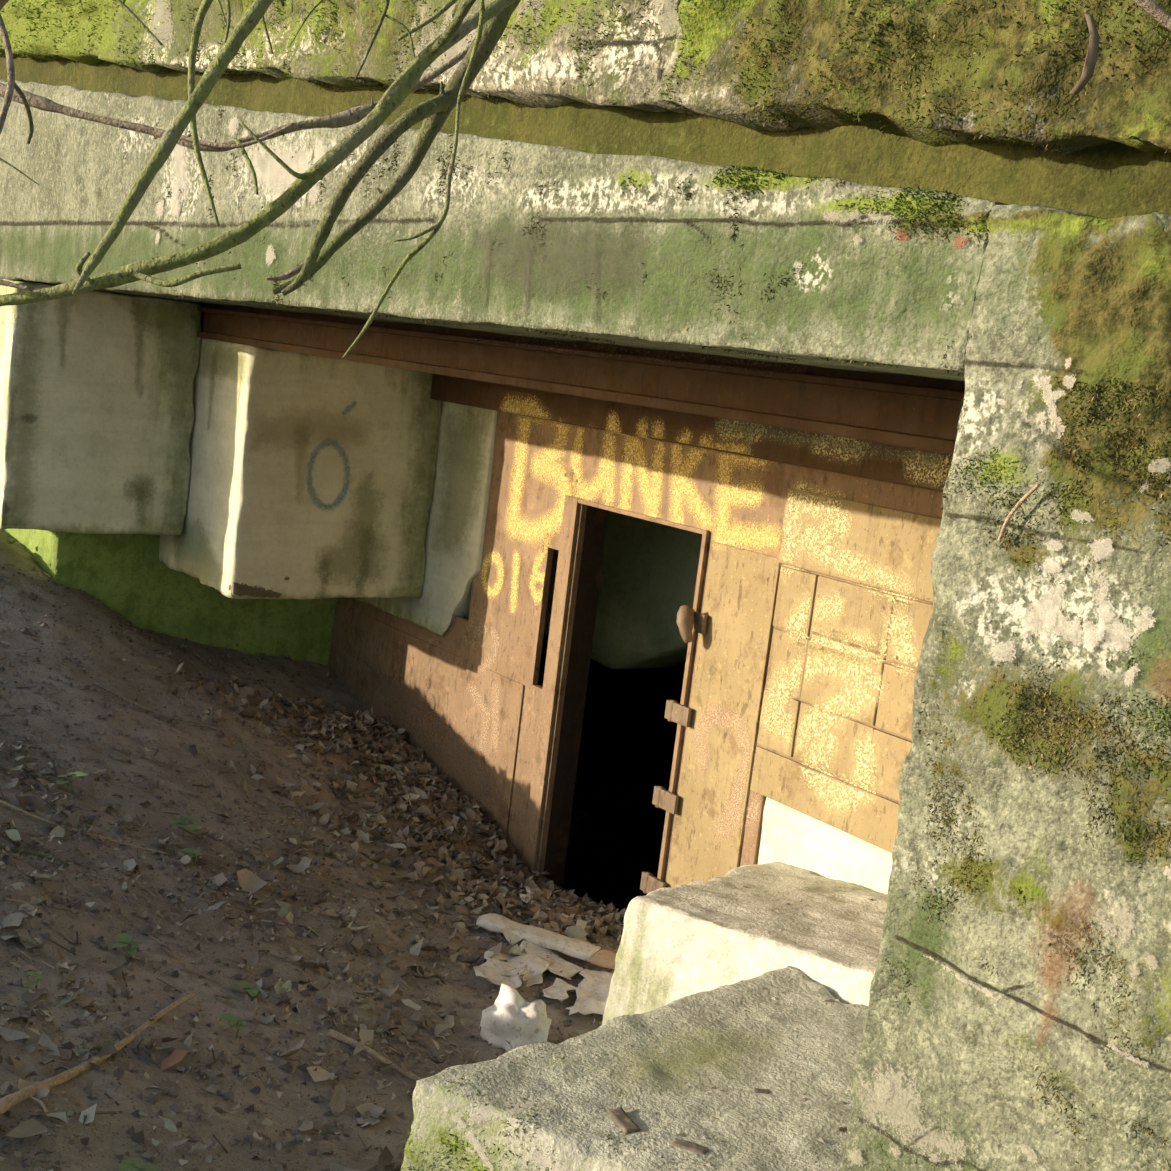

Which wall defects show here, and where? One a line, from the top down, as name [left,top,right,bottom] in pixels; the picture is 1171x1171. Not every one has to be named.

crack [895,935,1171,1072]